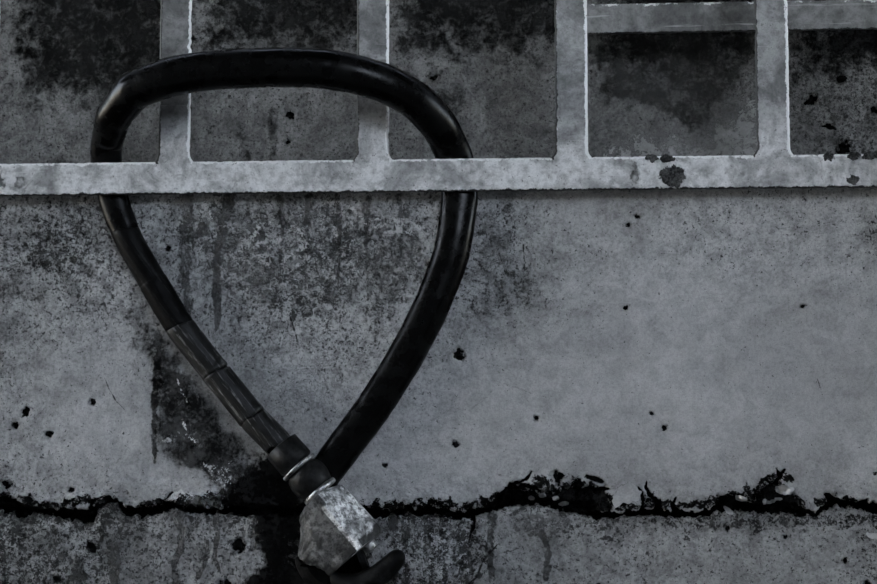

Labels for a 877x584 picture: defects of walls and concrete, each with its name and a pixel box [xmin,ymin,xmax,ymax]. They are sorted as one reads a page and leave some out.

damp [125,306,259,486]
crack [0,490,250,524]
crack [363,469,877,538]
spalling [716,481,800,516]
crack [469,545,497,584]